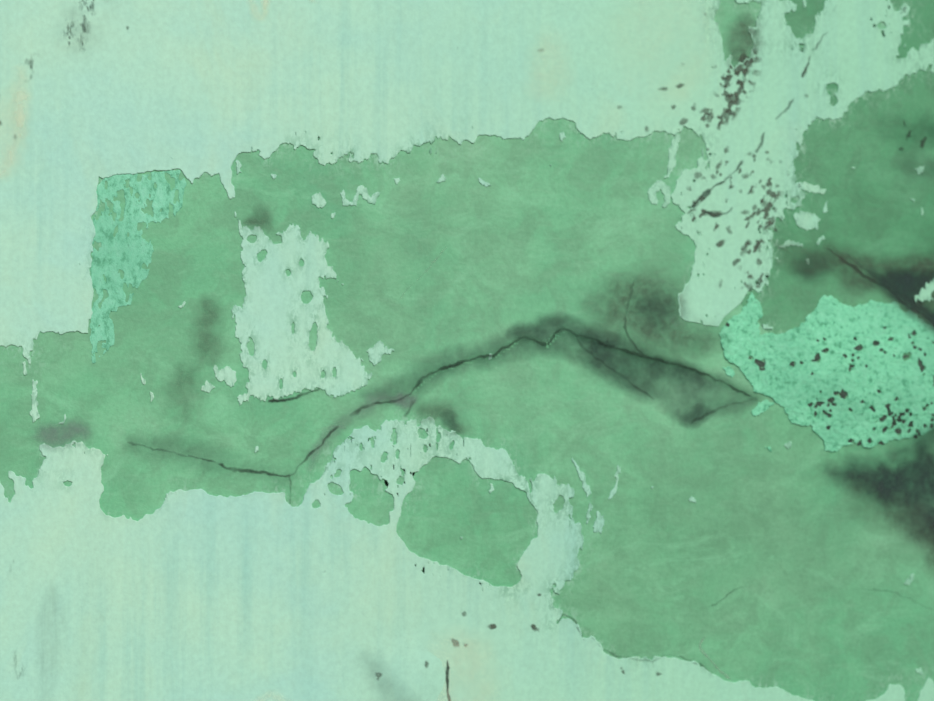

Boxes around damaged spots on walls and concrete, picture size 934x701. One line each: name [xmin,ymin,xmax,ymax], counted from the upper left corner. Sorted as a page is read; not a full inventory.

peeling [886,0,934,59]
peeling [91,170,163,221]
peeling [742,64,934,335]
crack [269,394,300,402]
flaking render [719,292,934,452]
peeling [390,428,405,488]
peeling [327,467,394,526]
peeling [396,456,538,587]
peeling [553,495,565,513]
damp [845,451,934,537]
crack [444,662,452,701]